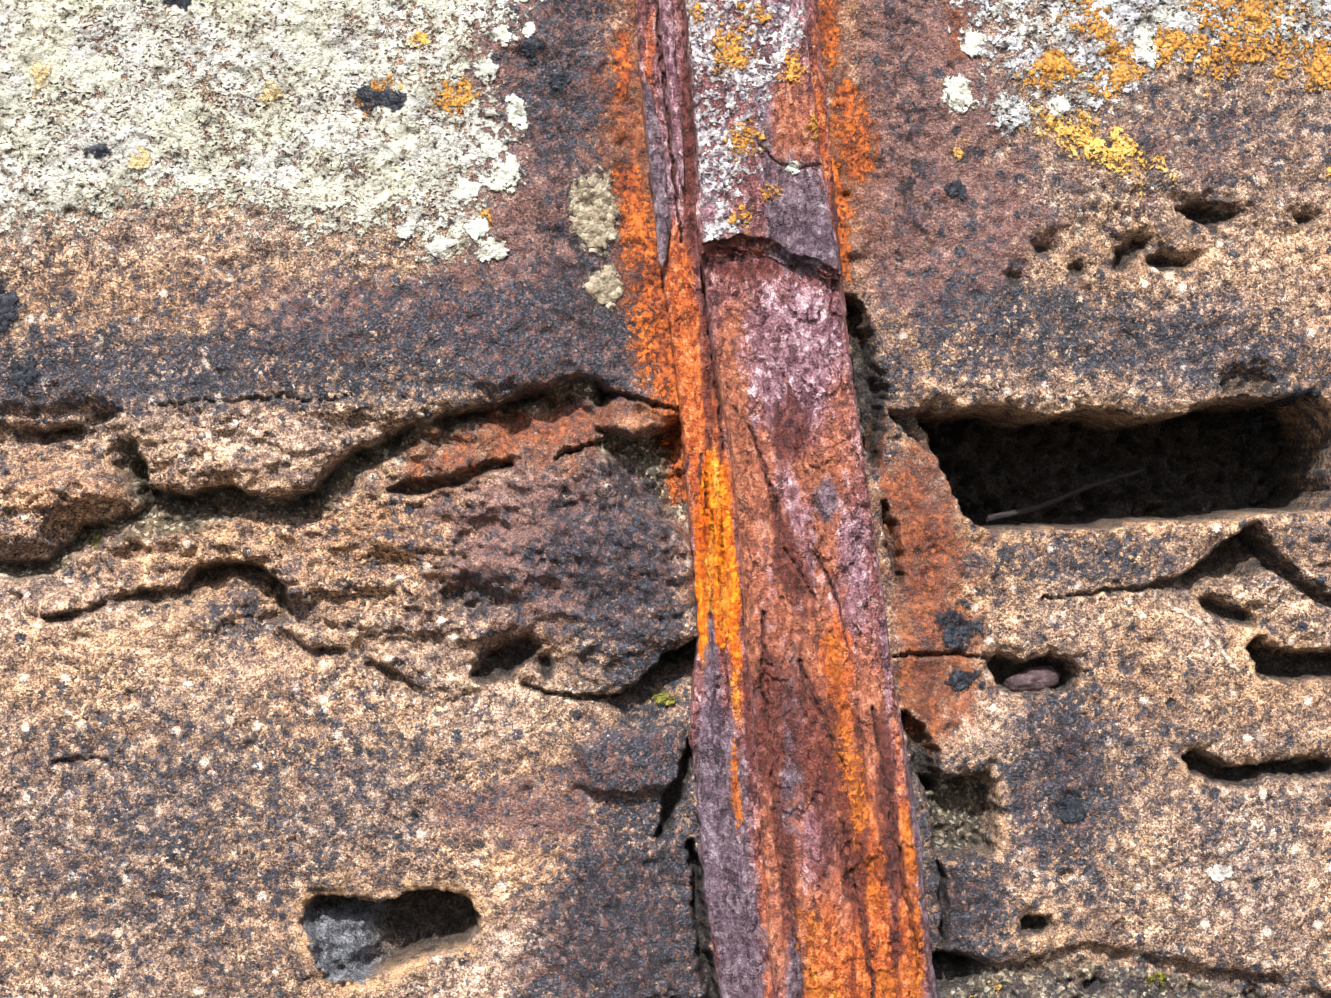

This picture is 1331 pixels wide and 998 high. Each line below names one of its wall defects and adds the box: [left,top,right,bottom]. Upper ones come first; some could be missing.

corrosion [816,0,879,315]
crack [0,274,851,998]
corrosion [592,0,742,668]
corrosion [730,739,744,838]
corrosion [824,633,889,909]
crack [842,820,876,995]
crack [829,288,907,588]
corrosion [876,802,924,998]
corrosion [873,438,987,746]
crack [892,648,990,663]
crack [871,706,1331,998]
crack [1041,521,1331,610]